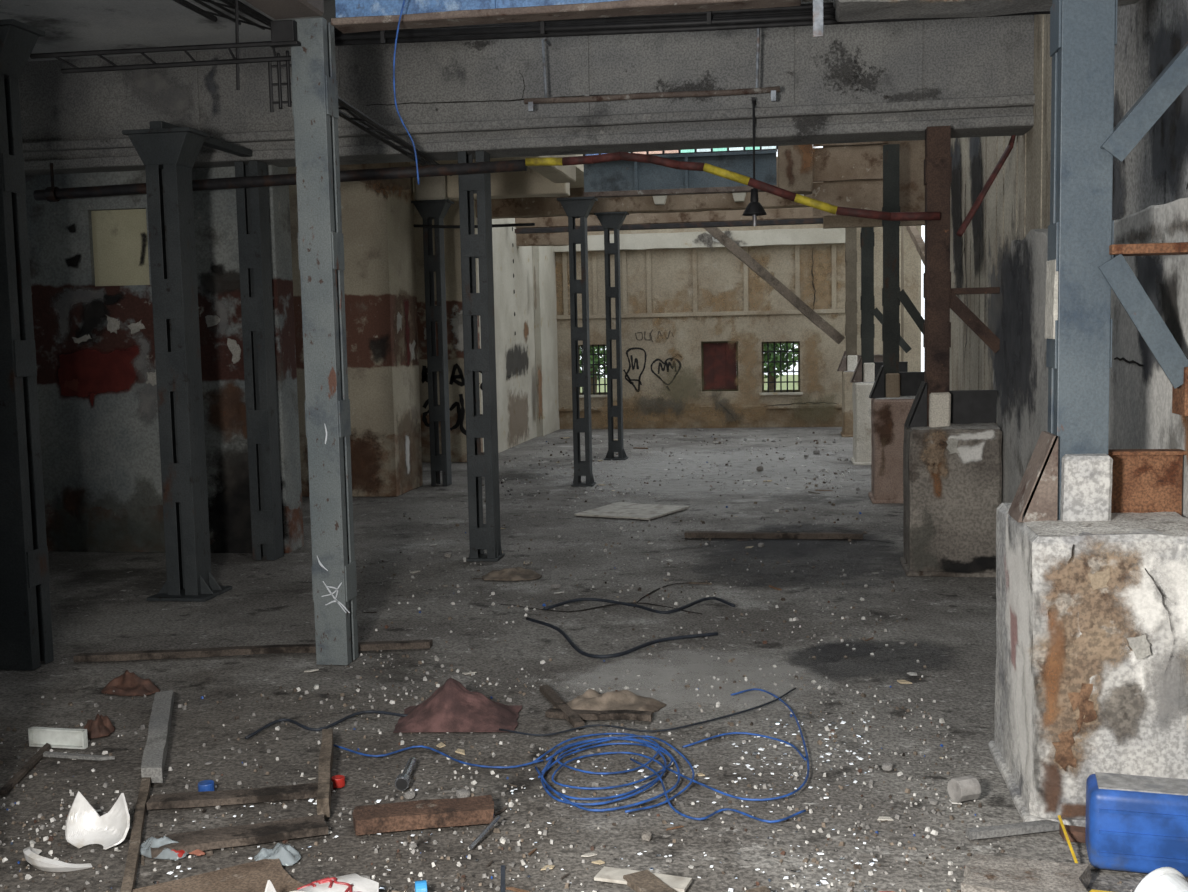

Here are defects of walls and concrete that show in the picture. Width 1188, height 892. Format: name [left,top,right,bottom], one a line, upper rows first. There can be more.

water stain [821,41,940,102]
water stain [1143,10,1188,82]
water stain [792,114,832,137]
water stain [1114,93,1122,127]
water stain [1149,85,1188,196]
water stain [1112,156,1126,220]
peeling [53,288,158,422]
peeling [394,291,426,366]
peeling [451,305,464,351]
water stain [1138,331,1159,383]
water stain [1135,256,1181,348]
crack [1145,568,1177,660]